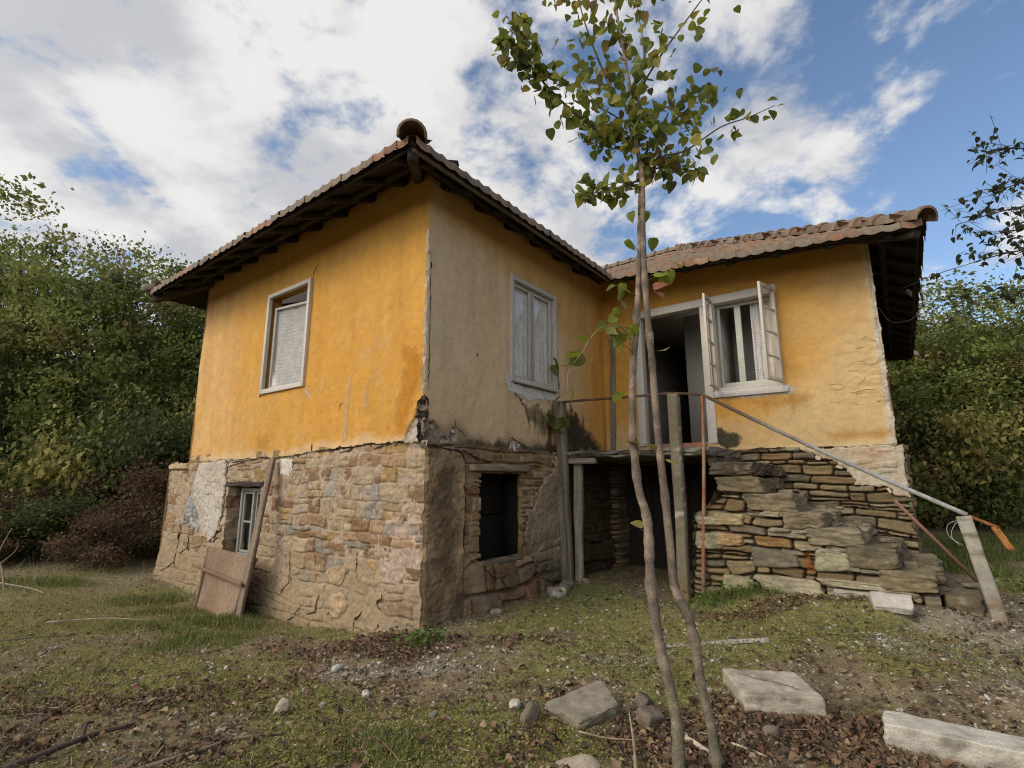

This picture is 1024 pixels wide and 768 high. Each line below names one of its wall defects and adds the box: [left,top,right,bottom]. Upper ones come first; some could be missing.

flaking render [404,229,457,448]
water stain [467,394,598,452]
peeling [180,459,228,542]
peeling [279,458,293,476]
crack [227,421,492,548]
crack [160,514,217,571]
crack [279,561,382,631]